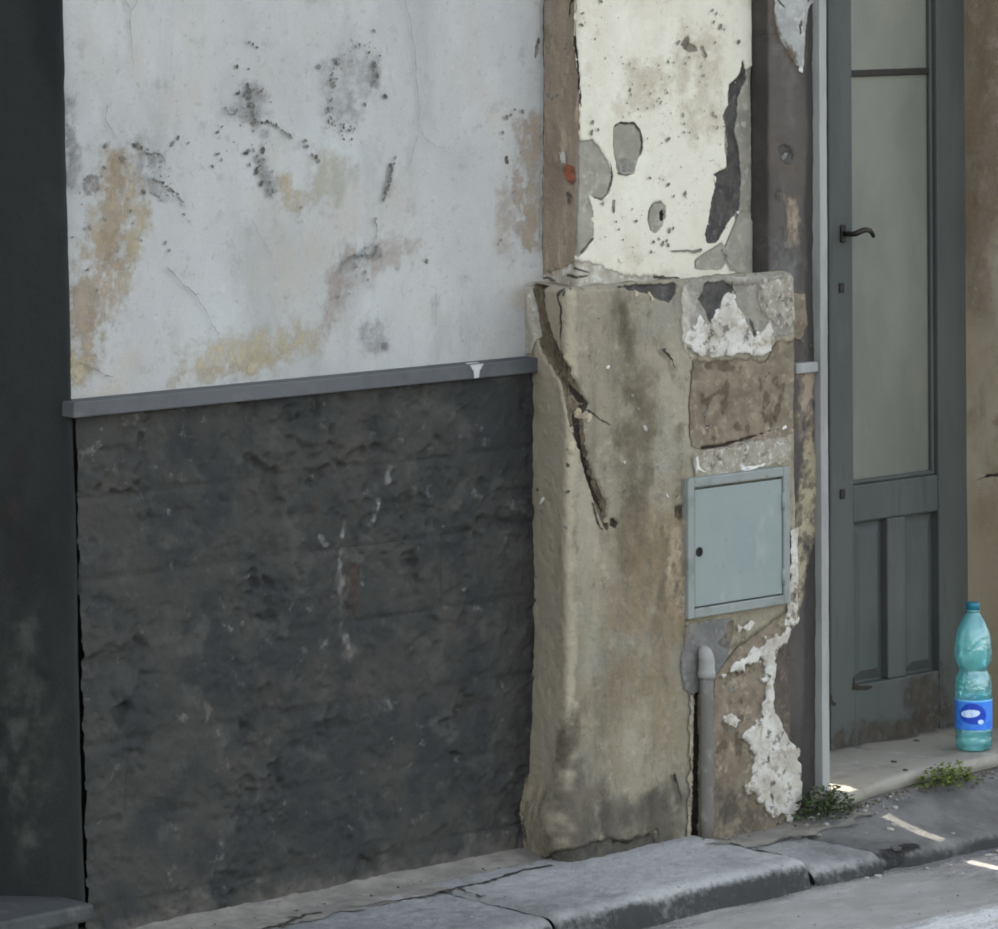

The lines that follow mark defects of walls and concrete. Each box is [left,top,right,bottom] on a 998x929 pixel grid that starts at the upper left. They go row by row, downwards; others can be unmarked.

flaking render [772,0,814,73]
leakage [70,145,149,383]
flaking render [525,0,795,451]
crack [533,283,617,530]
flaking render [545,828,659,861]
flaking render [673,693,699,836]
flaking render [714,527,802,840]